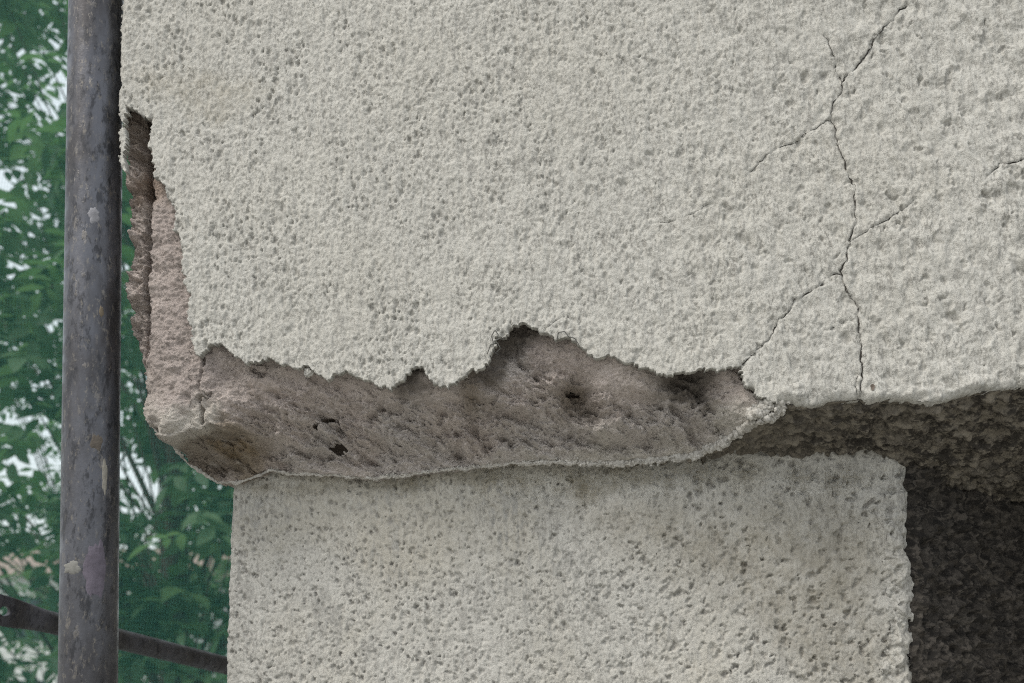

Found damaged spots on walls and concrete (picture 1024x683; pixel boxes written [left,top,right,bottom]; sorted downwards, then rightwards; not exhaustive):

flaking render [125,111,790,488]
crack [742,7,914,408]